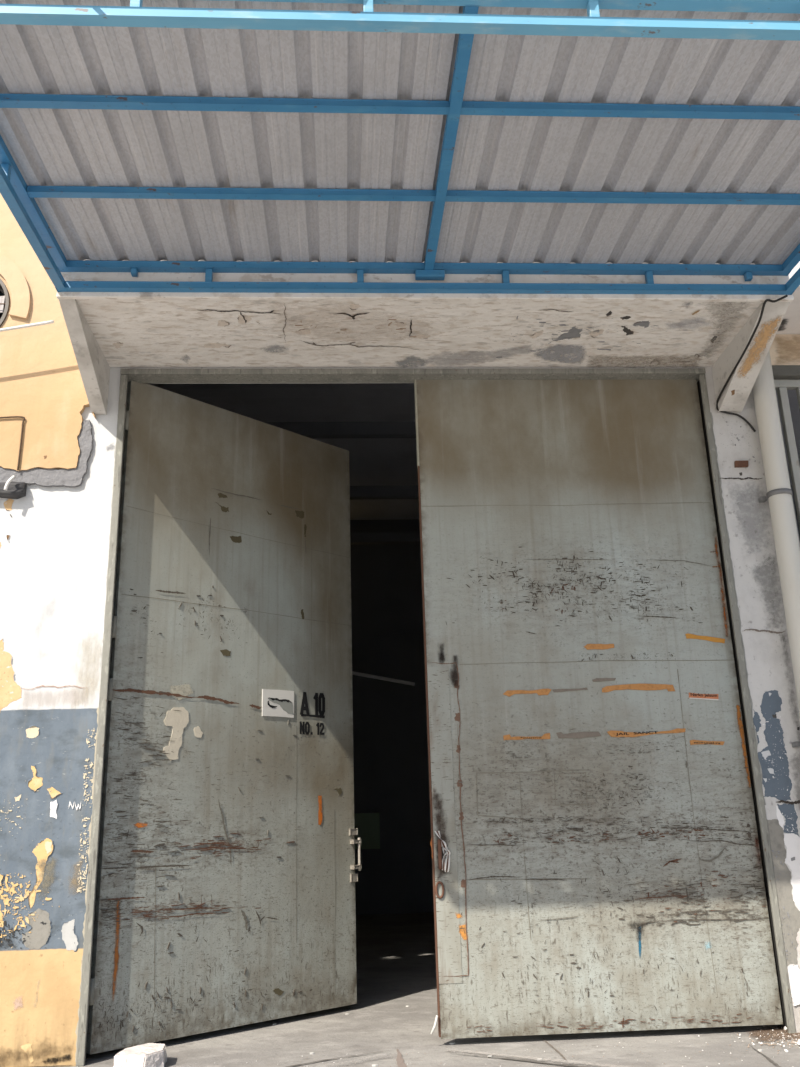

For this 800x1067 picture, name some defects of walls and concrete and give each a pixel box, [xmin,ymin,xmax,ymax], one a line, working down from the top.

crack [201,303,420,351]
leakage [537,345,584,363]
peeling [0,638,22,710]
peeling [0,765,63,836]
peeling [26,725,40,738]
peeling [83,730,96,804]
peeling [76,817,90,892]
spalling [0,838,79,952]